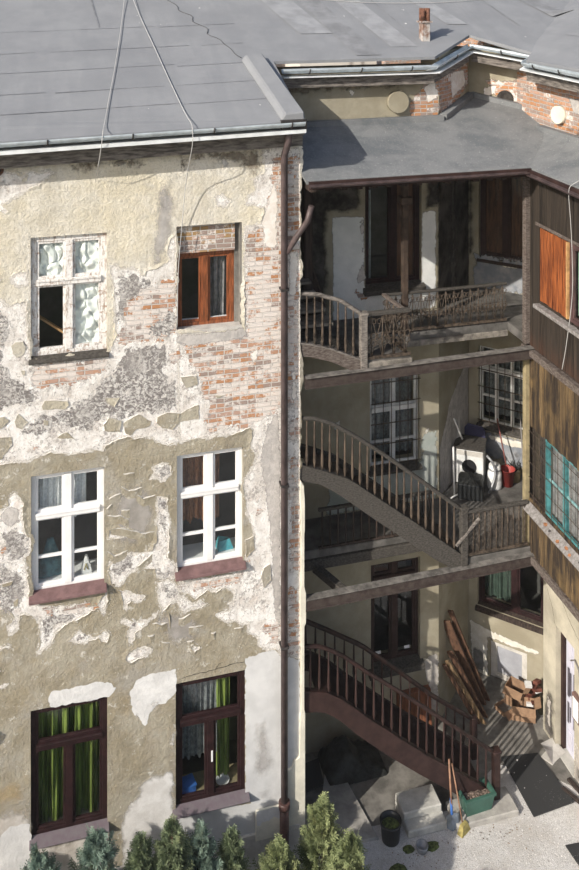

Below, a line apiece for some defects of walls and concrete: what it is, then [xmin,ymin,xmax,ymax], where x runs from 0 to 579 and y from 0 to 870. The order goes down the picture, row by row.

crack [168,0,242,58]
flaking render [409,62,468,116]
flaking render [484,79,517,102]
flaking render [0,146,304,665]